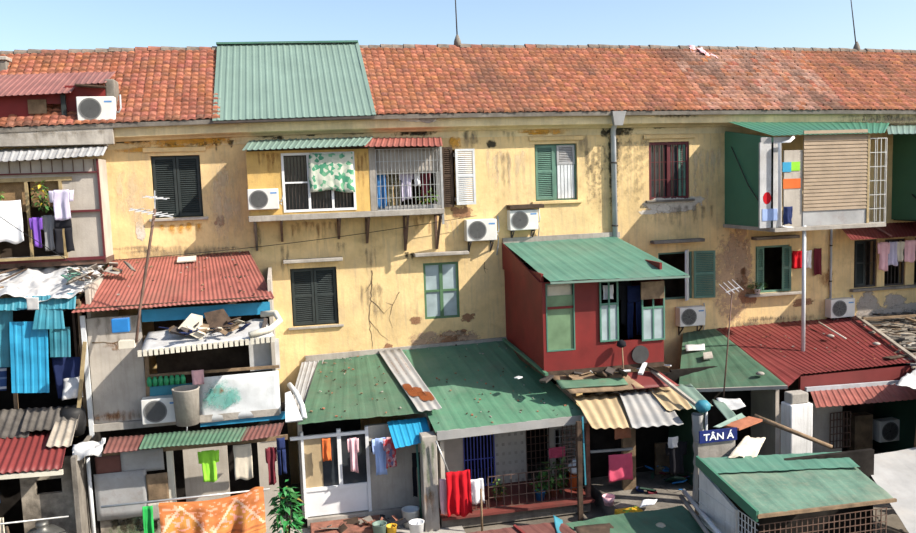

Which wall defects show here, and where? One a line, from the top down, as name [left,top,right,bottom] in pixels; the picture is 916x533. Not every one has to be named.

damp [586,128,648,199]
crack [366,271,400,346]
flaking render [856,291,916,317]
flaking render [410,313,477,345]
corrosion [402,384,435,401]